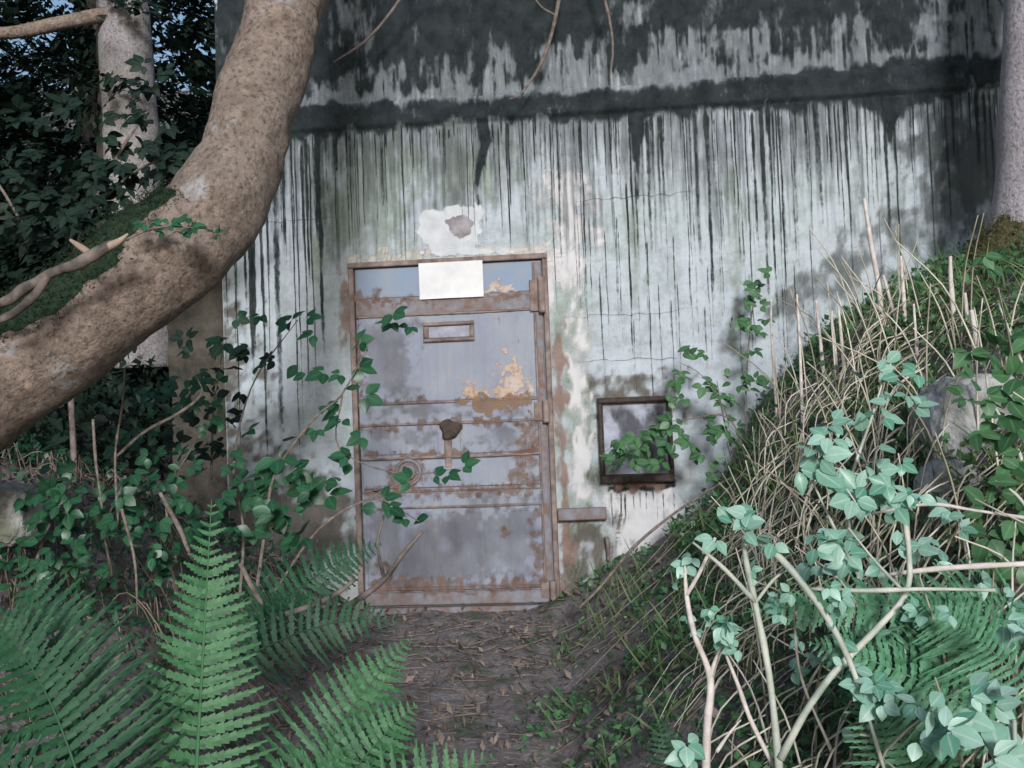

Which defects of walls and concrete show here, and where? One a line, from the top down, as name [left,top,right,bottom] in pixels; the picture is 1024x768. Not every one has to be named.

water stain [214,0,245,81]
peeling [416,202,515,258]
water stain [226,0,1003,558]
corrosion [552,323,570,508]
corrosion [371,532,547,597]